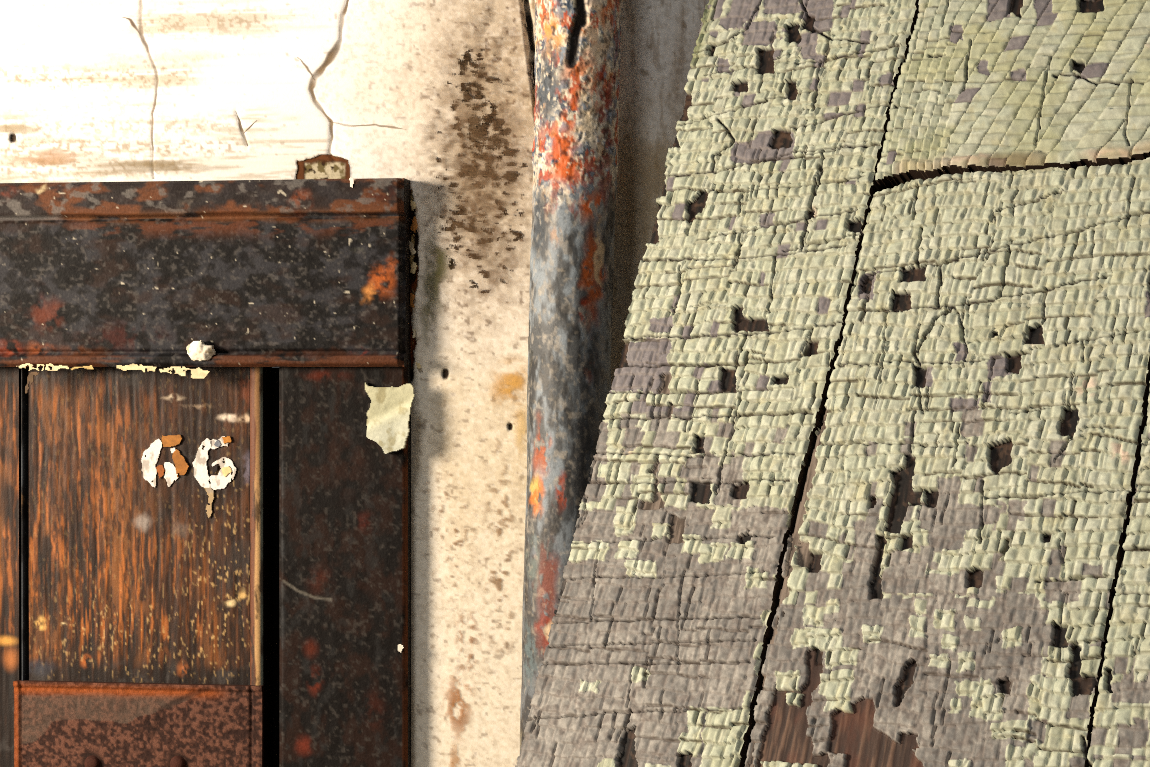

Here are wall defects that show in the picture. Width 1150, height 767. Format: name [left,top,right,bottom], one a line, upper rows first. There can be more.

crack [123,17,149,53]
crack [150,92,158,150]
crack [297,43,401,155]
water stain [424,248,445,314]